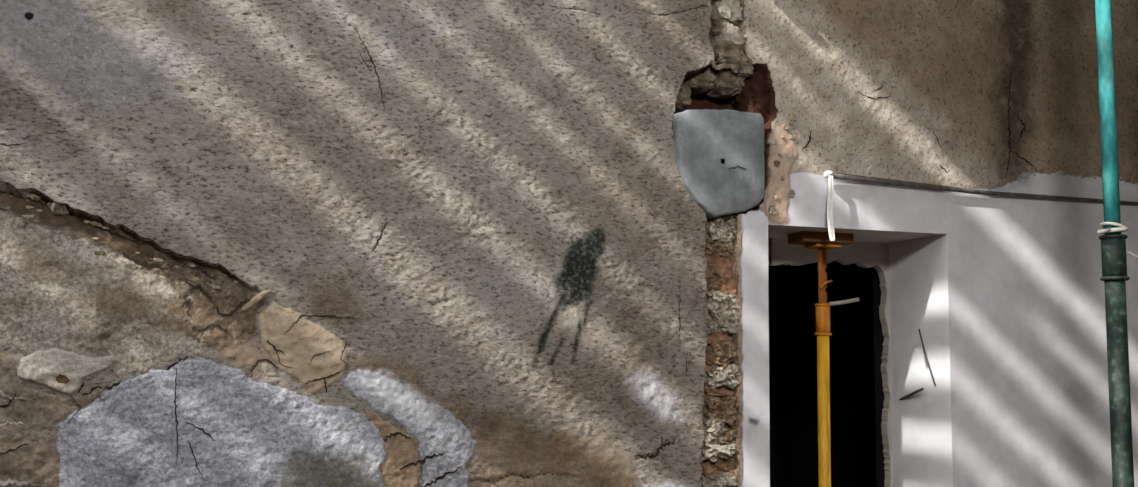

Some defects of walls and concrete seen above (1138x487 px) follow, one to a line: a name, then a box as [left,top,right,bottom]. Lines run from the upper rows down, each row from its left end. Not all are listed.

flaking render [0,179,359,487]
water stain [532,293,592,366]